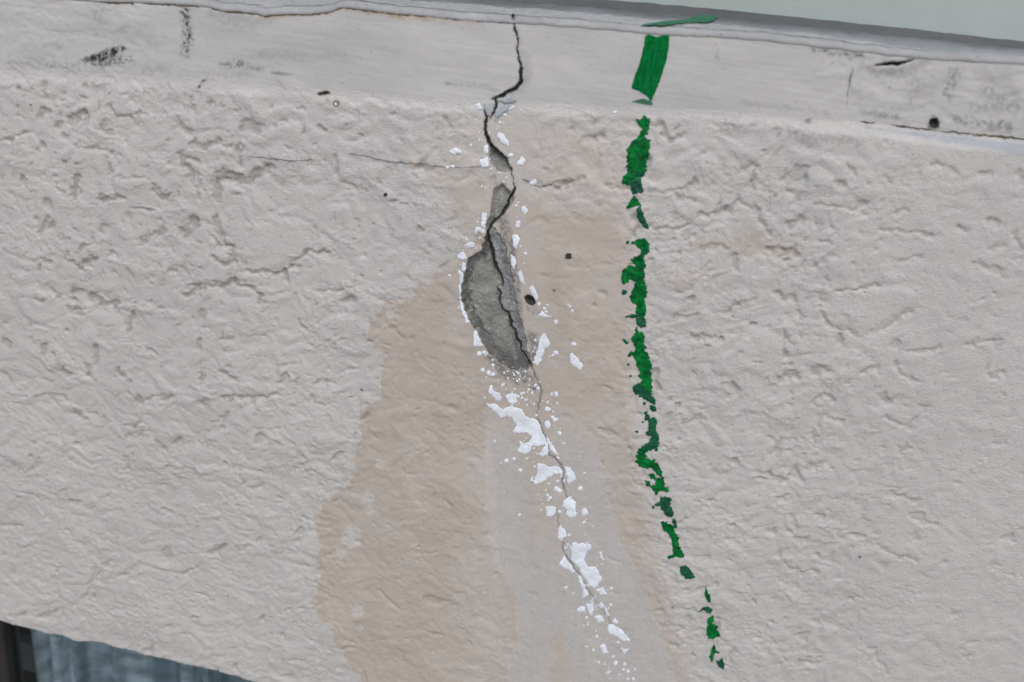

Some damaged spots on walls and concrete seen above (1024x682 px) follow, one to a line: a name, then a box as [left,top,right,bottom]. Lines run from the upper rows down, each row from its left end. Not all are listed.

crack [104,2,628,642]
damp [310,160,687,682]
spalling [446,96,636,681]